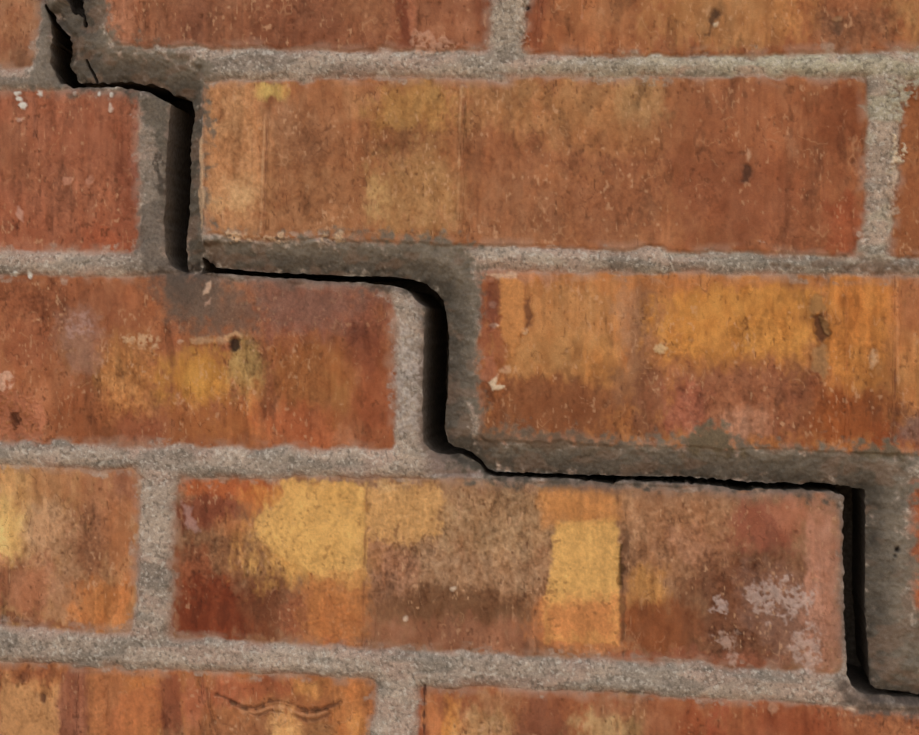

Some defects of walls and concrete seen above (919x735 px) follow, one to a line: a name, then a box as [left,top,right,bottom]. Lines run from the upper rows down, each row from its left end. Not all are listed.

crack [45,0,195,273]
crack [202,257,919,698]